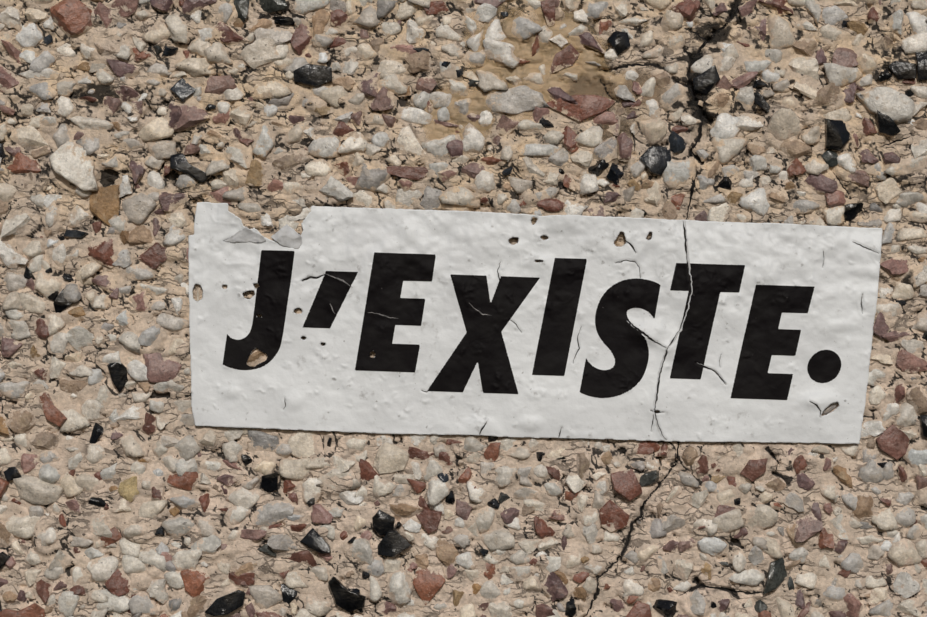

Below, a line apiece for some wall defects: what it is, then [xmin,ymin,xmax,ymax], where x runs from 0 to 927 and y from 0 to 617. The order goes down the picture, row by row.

crack [599,3,738,220]
crack [583,441,679,617]
crack [681,579,762,597]